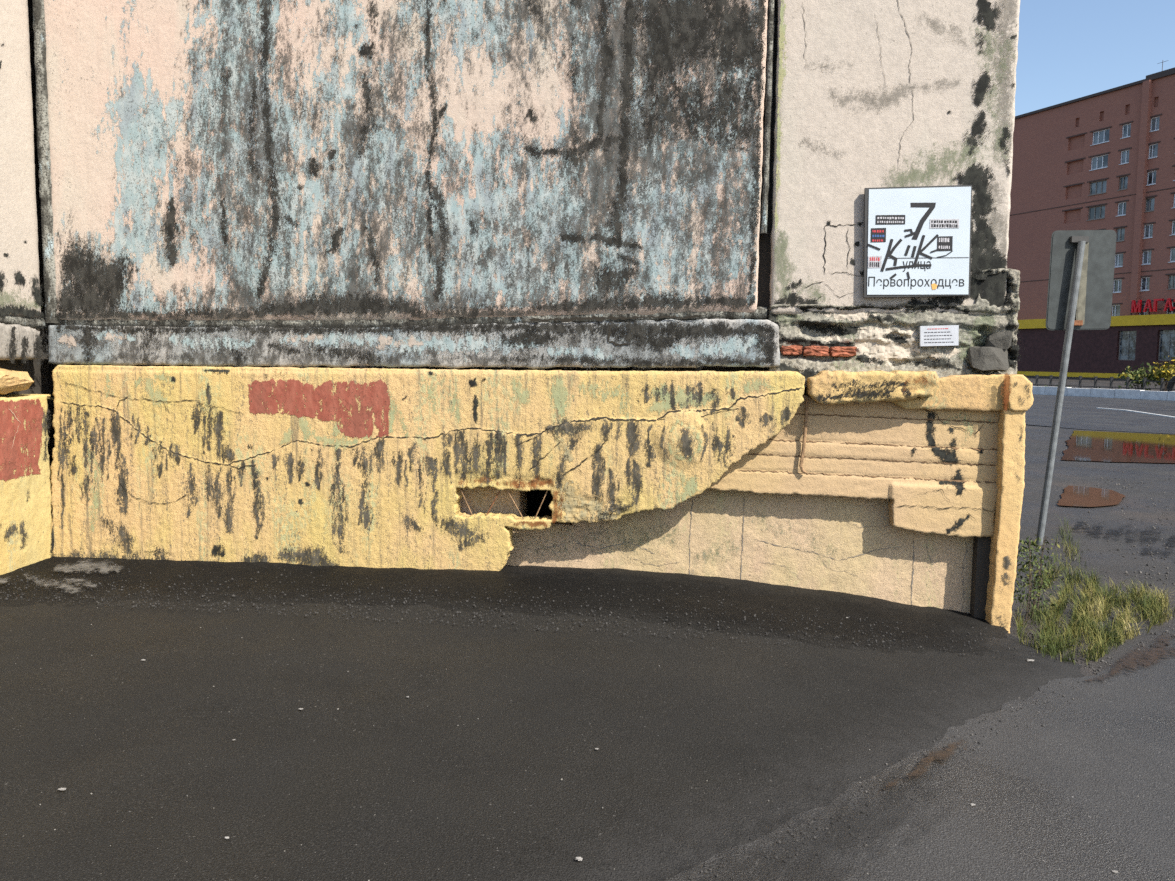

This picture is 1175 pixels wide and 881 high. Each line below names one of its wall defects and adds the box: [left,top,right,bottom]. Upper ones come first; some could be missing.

peeling [55,0,765,316]
peeling [775,0,787,232]
crack [876,0,914,171]
damp [0,0,1031,466]
peeling [776,308,968,367]
damp [0,521,29,548]
damp [26,382,543,593]
crack [63,382,801,475]
damp [591,419,656,520]
peeling [925,412,991,495]
peeling [946,514,970,534]
damp [1001,555,1013,586]